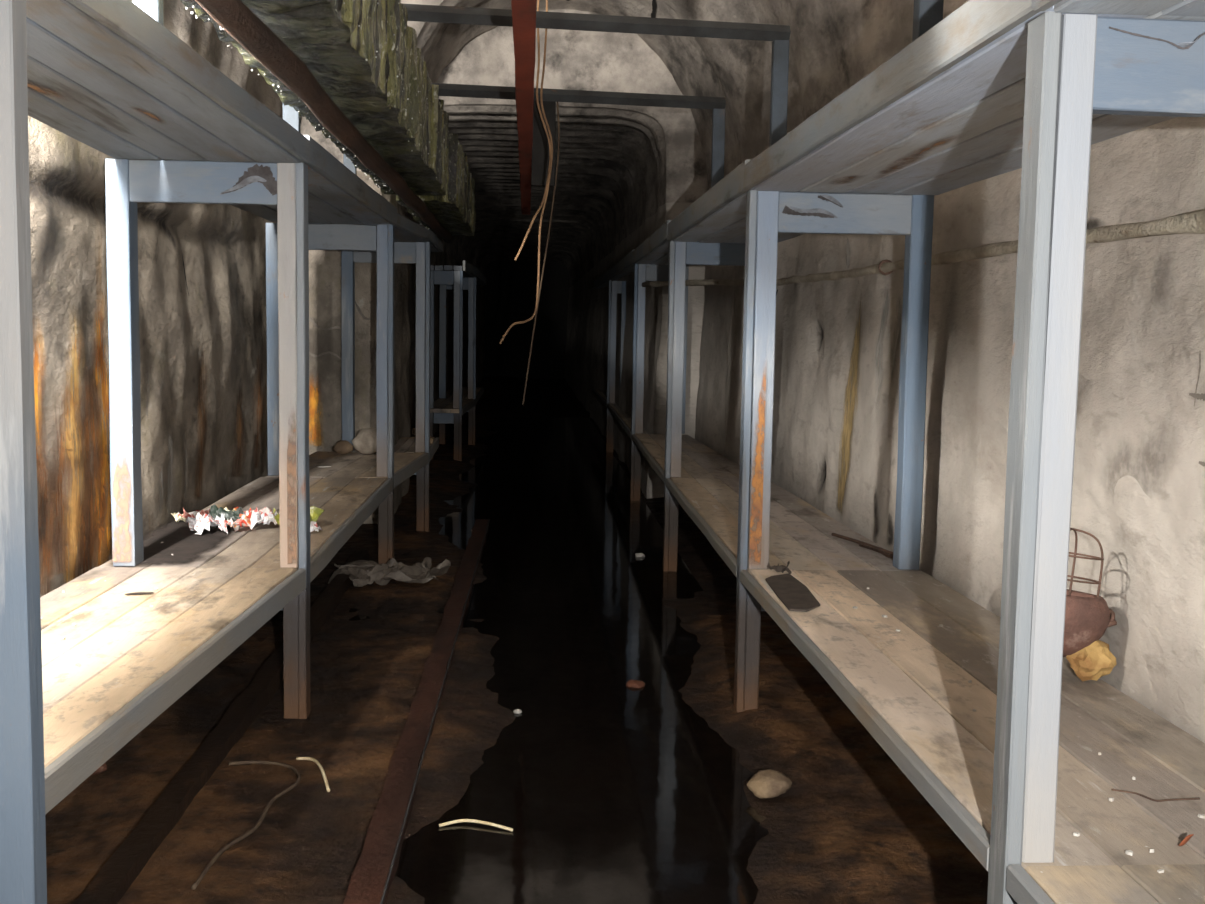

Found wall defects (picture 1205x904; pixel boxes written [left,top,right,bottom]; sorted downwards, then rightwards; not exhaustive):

rust [33,316,131,595]
rust [749,374,766,564]